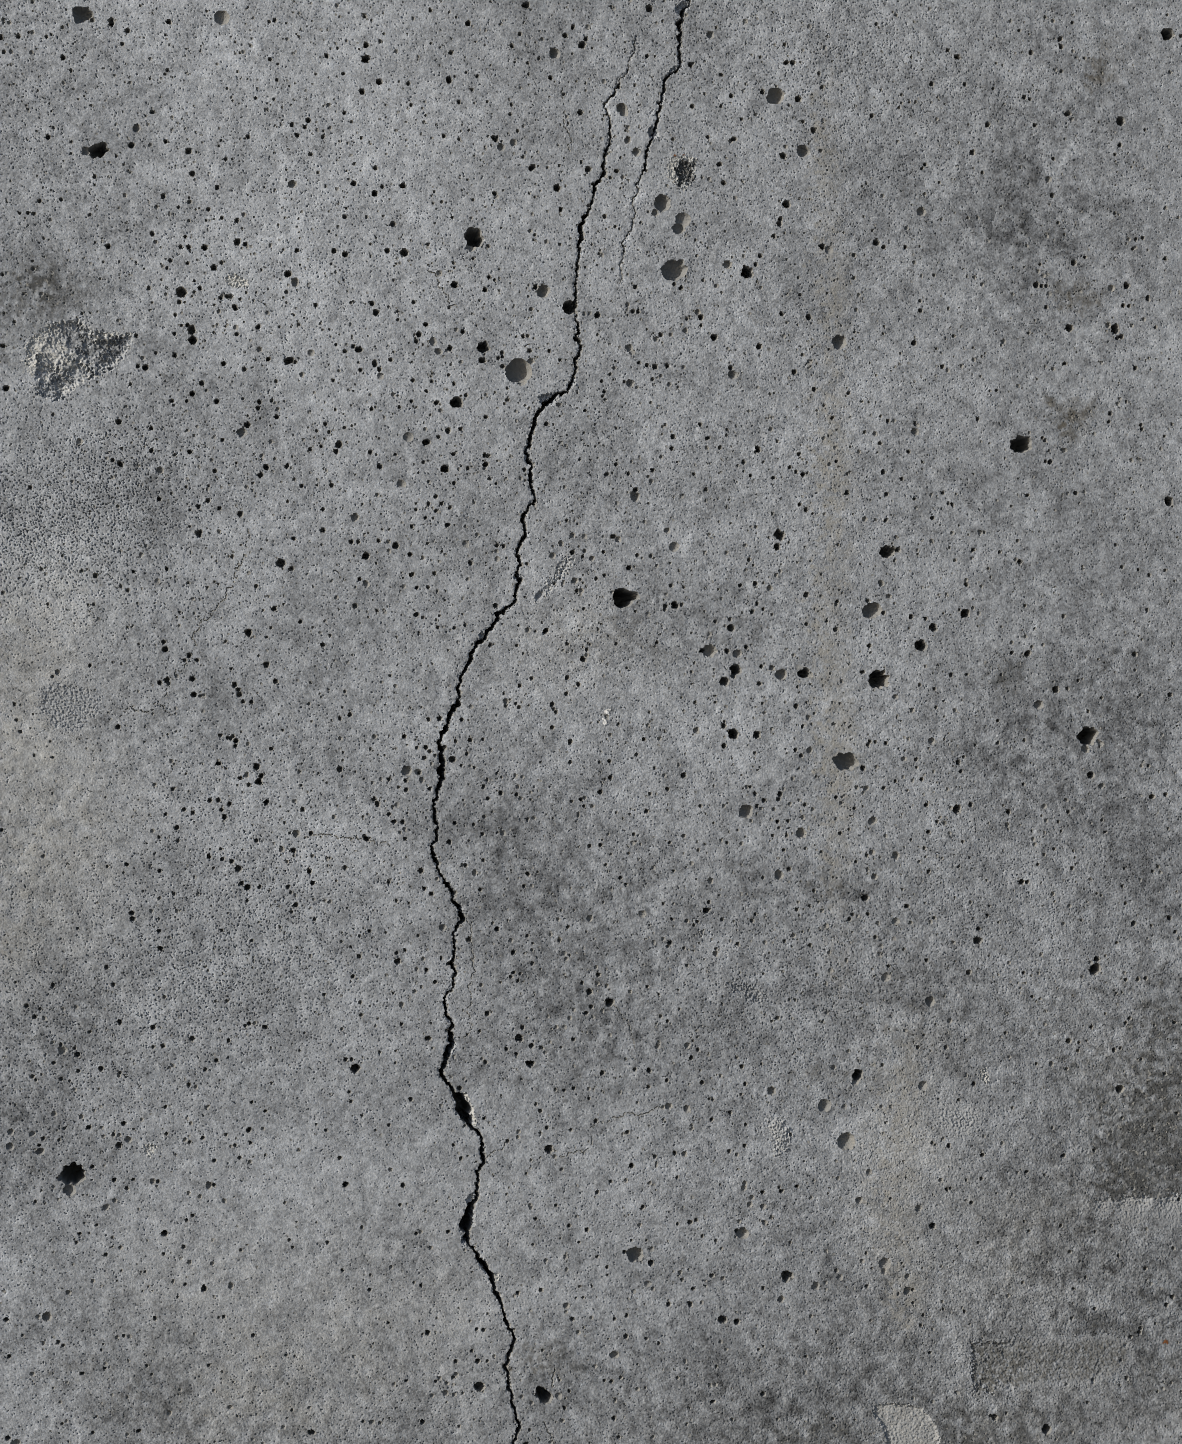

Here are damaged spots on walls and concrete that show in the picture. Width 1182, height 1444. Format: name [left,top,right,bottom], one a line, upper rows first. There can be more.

crack [313,833,390,847]
crack [427,0,691,1444]